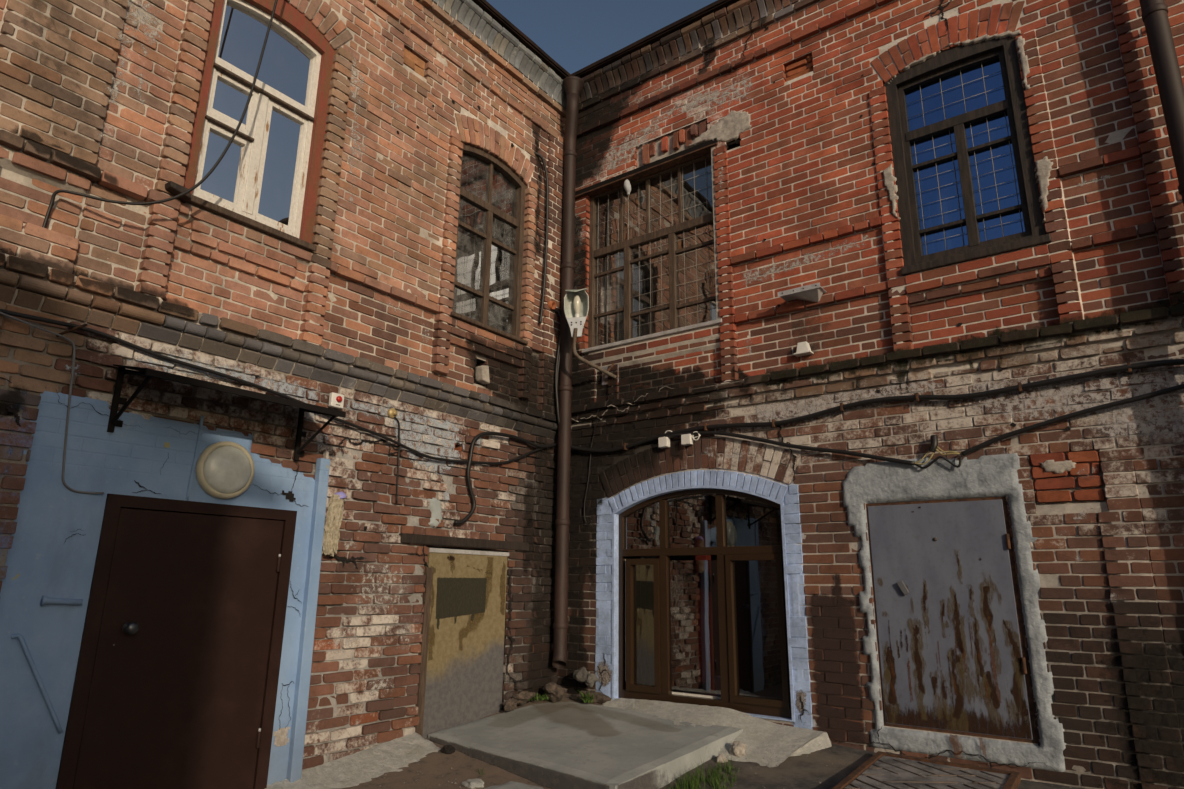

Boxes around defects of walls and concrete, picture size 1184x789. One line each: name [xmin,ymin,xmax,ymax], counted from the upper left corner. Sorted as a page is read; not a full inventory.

crack [924,0,952,31]
spalling [636,118,708,168]
crack [56,390,191,494]
peeling [126,351,317,419]
peeling [347,400,482,475]
peeling [750,378,944,423]
peeling [967,366,1184,444]
peeling [357,555,410,650]
corrosion [883,553,1032,759]
crack [279,681,294,730]